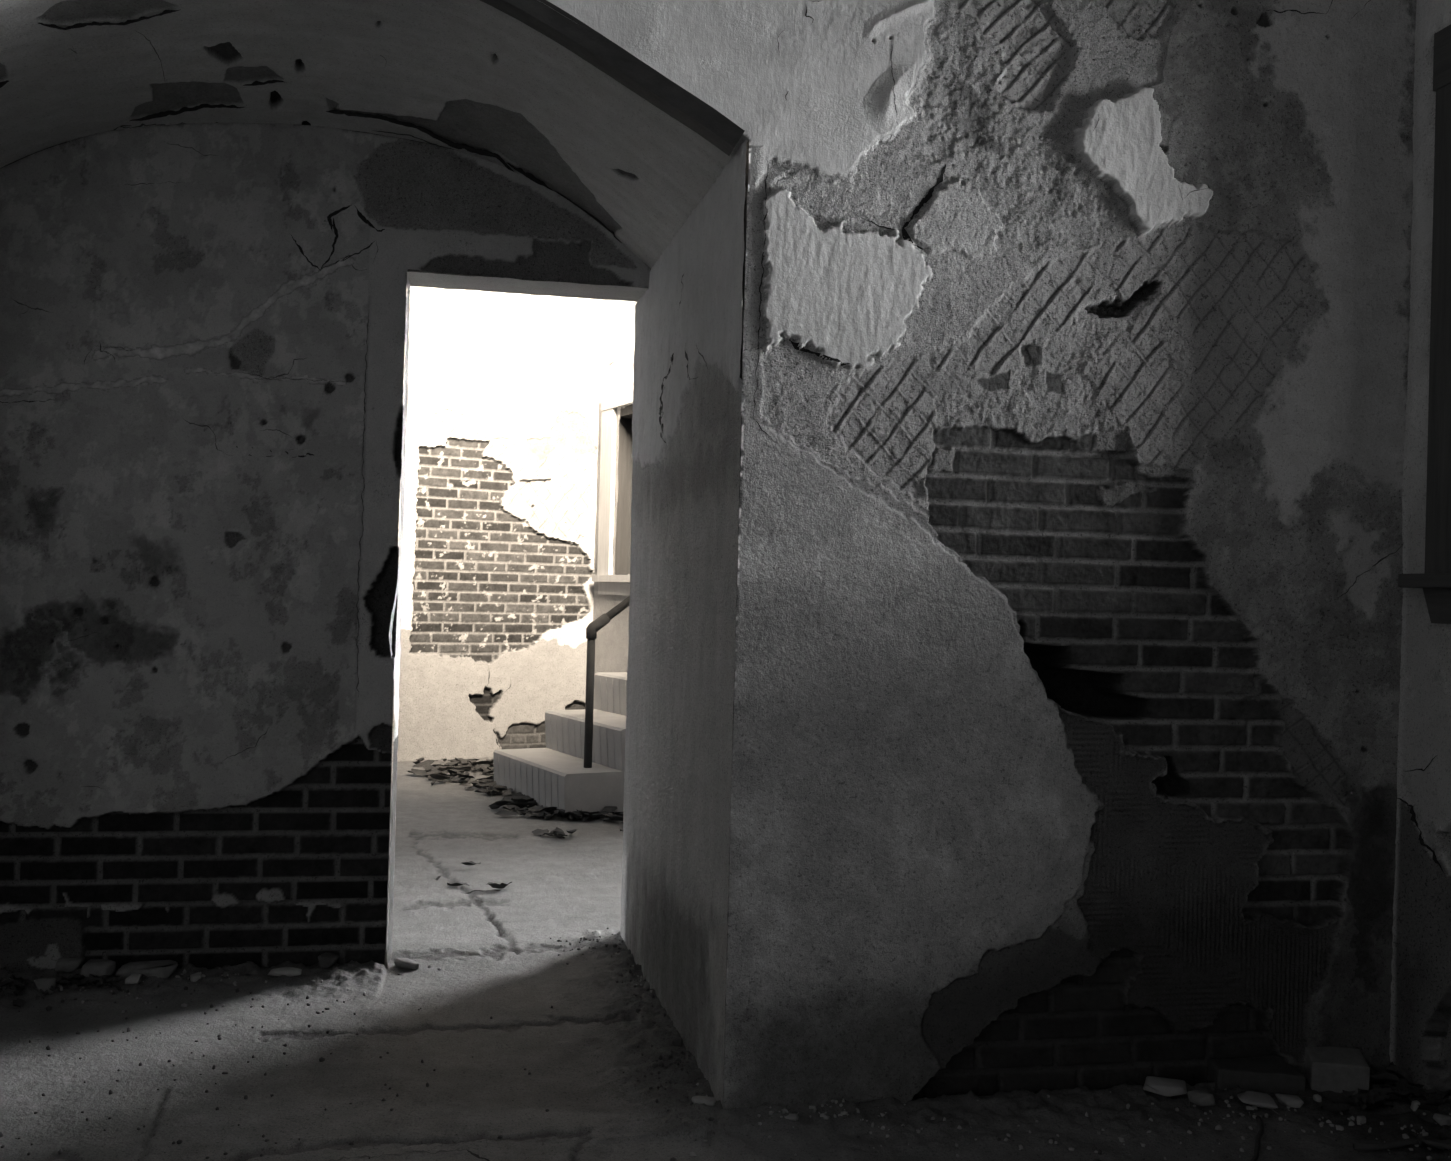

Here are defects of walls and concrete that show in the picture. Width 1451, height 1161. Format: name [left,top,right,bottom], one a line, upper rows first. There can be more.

peeling [35,0,179,25]
peeling [130,42,285,119]
crack [289,205,385,271]
flaking render [325,98,747,468]
flaking render [760,0,1354,929]
flaking render [364,406,595,664]
flaking render [469,687,546,749]
flaking render [565,701,585,710]
flaking render [0,722,393,984]
flaking render [1275,1094,1322,1108]
flaking render [1410,1100,1451,1126]